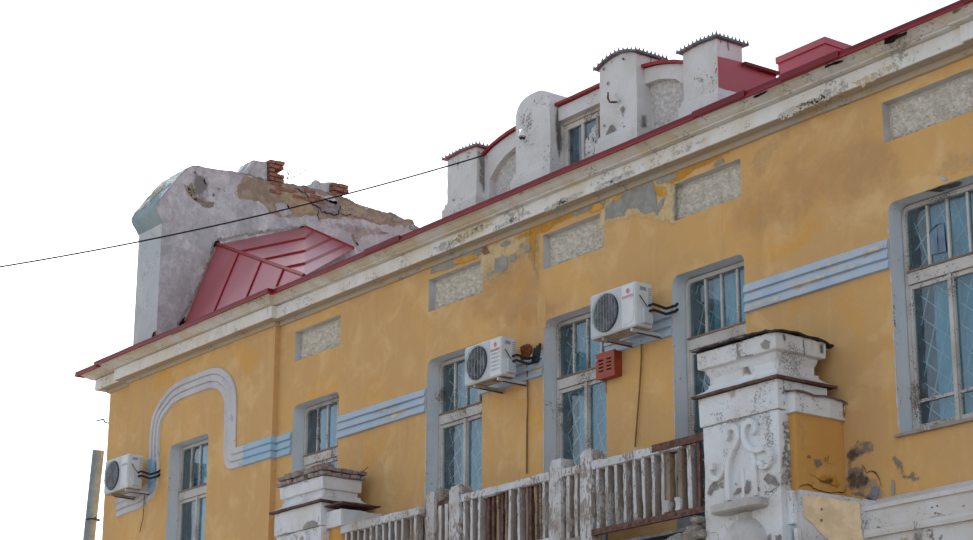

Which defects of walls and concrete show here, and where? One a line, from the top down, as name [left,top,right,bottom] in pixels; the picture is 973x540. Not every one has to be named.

peeling [778,63,898,120]
peeling [544,152,729,226]
flaking render [177,171,414,327]
peeling [430,211,538,281]
peeling [803,496,880,540]